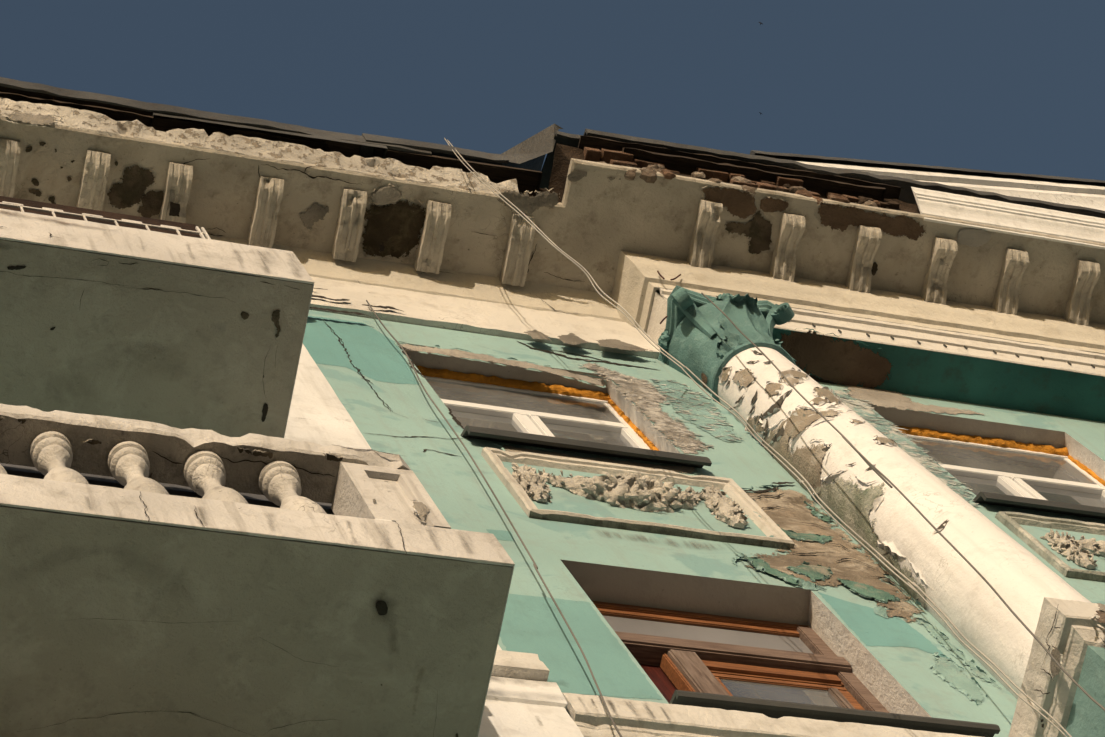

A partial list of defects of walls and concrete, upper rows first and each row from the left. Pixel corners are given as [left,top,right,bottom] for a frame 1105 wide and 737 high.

flaking render [0,110,63,127]
flaking render [29,179,56,204]
flaking render [104,160,164,218]
spalling [494,187,559,215]
flaking render [567,147,927,255]
flaking render [359,184,426,260]
crack [263,281,464,457]
crack [153,451,335,478]
peeling [394,328,1001,705]
flaking render [1090,603,1105,629]
flaking render [1050,647,1063,680]